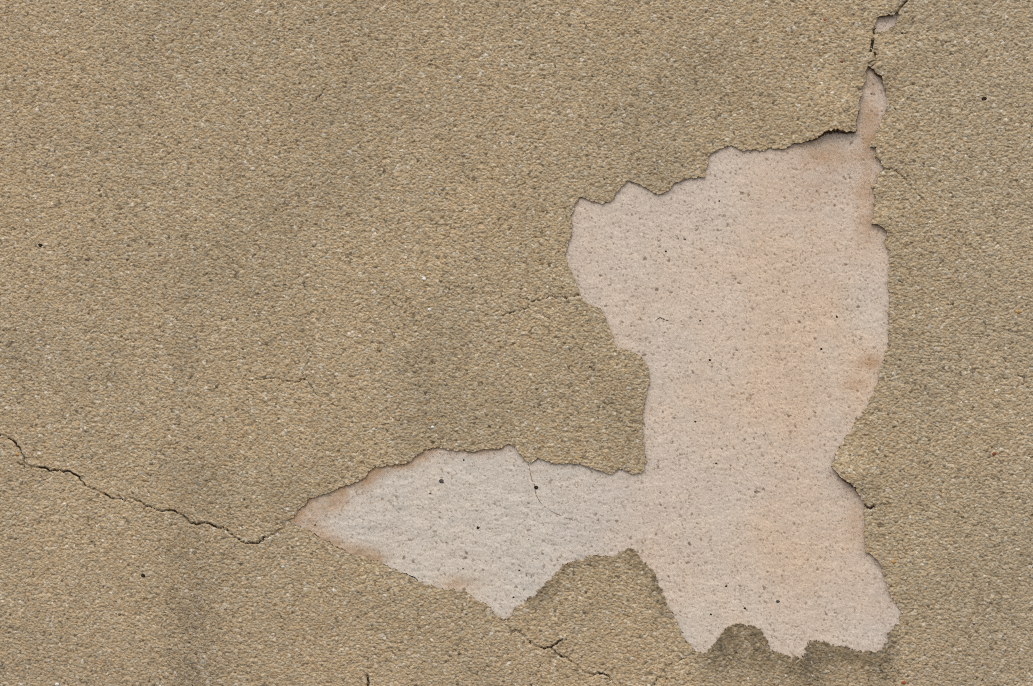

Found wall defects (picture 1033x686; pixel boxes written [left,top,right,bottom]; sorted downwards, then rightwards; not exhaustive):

crack [870,28,878,66]
flaking render [289,12,904,659]
crack [0,435,284,544]
crack [514,629,611,686]